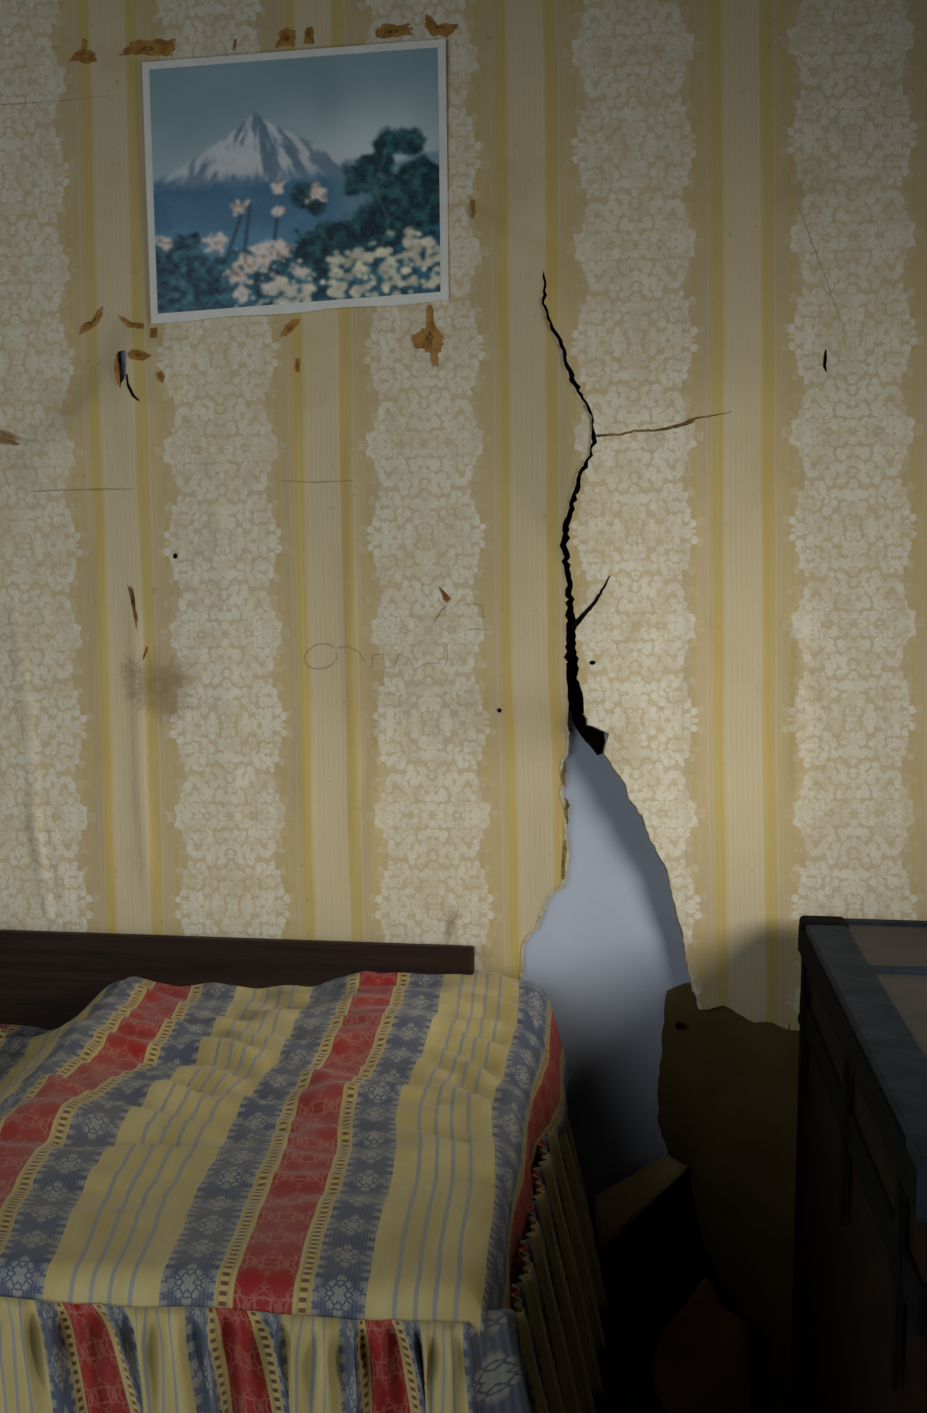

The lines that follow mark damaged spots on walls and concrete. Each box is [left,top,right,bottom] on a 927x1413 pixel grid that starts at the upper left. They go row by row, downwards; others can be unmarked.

crack [542,273,731,755]
peeling [561,762,570,879]